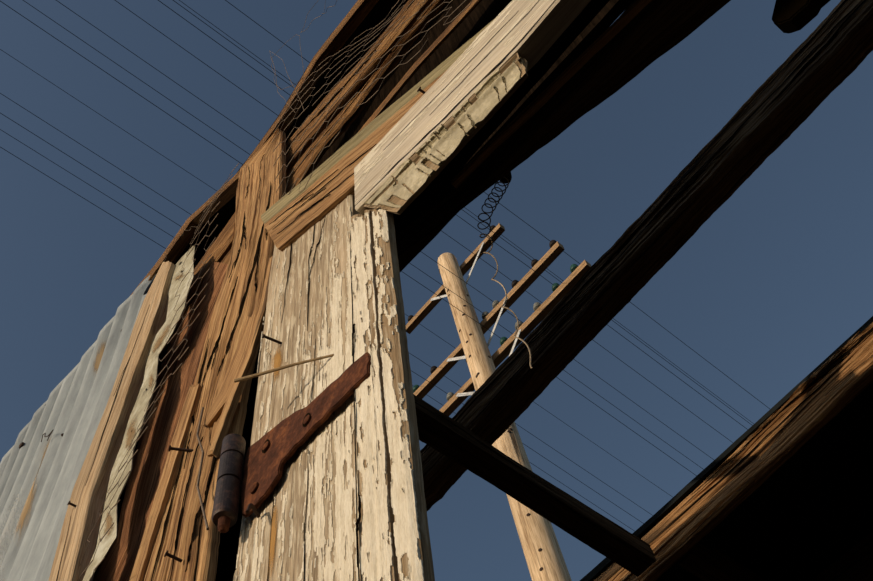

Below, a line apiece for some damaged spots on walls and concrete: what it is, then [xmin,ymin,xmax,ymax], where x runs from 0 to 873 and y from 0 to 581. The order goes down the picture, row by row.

crack [198,0,555,403]
peeling [233,0,552,581]
crack [435,0,866,484]
crack [151,412,217,581]
crack [267,488,275,581]
crack [302,439,310,581]
crack [353,390,361,581]